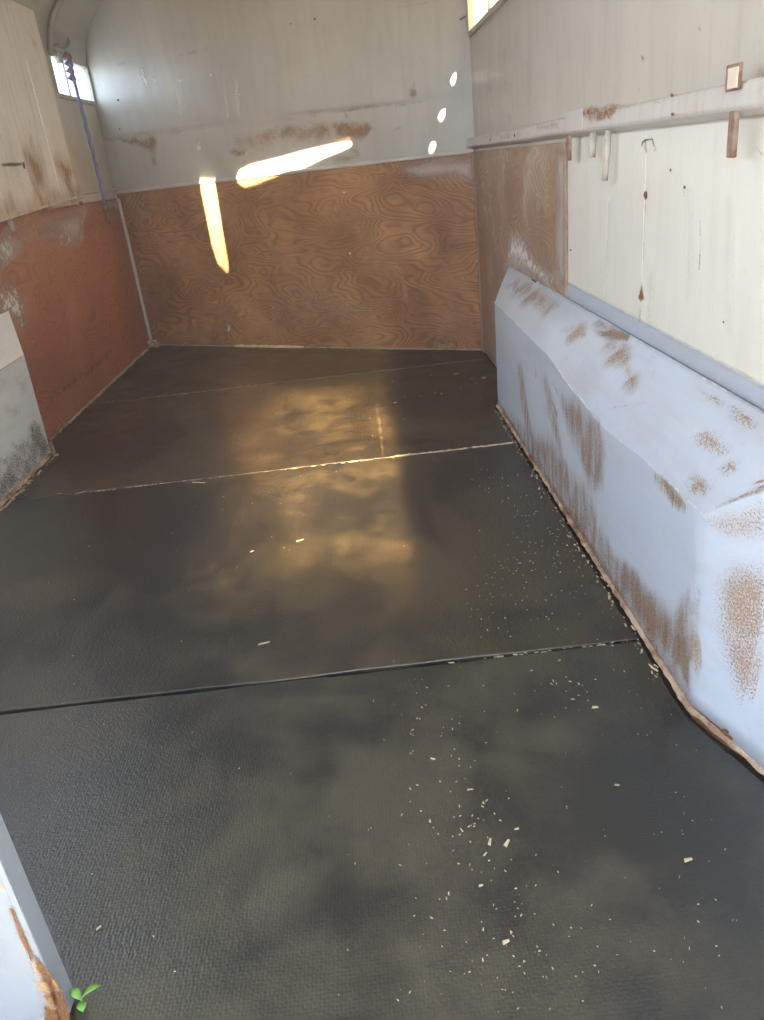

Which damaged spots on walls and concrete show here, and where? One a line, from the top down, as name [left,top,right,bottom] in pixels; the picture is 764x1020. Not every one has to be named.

corrosion [232,114,371,155]
corrosion [583,105,616,121]
corrosion [25,153,79,205]
corrosion [597,322,629,363]
damp [0,422,51,503]
corrosion [699,432,735,472]
corrosion [518,372,700,681]
corrosion [718,567,764,701]
corrosion [689,710,747,760]
corrosion [10,909,70,1020]